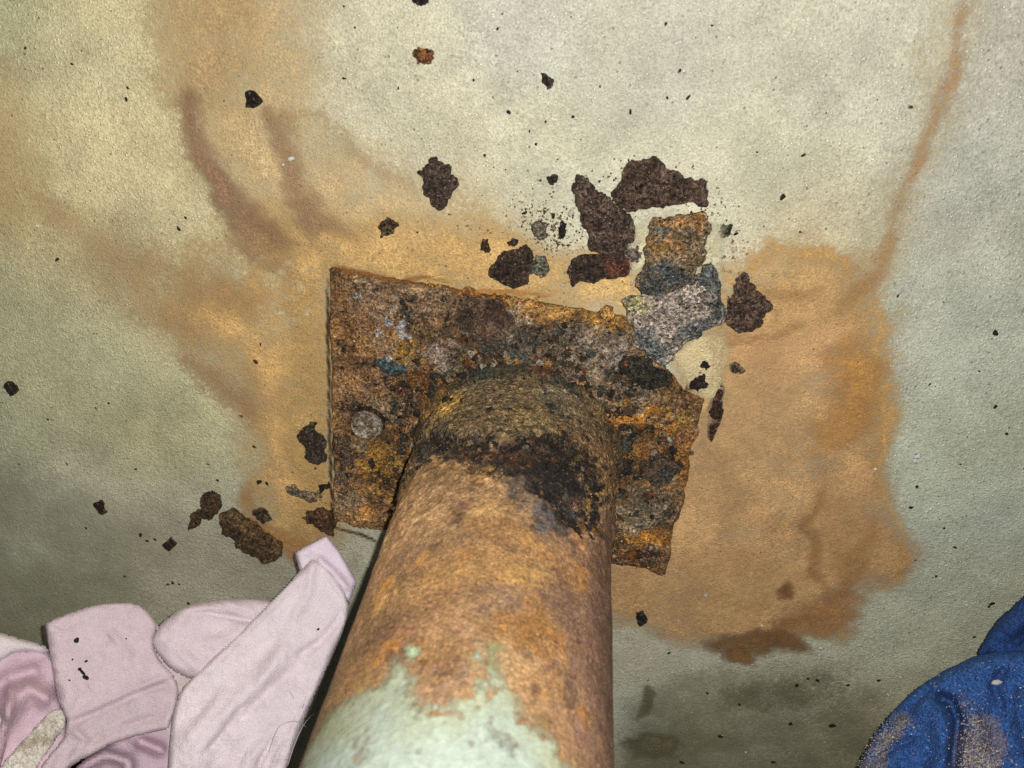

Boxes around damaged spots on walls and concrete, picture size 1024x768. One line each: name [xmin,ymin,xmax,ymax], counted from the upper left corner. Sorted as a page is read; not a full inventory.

corrosion [165,0,919,665]
peeling [621,223,728,398]